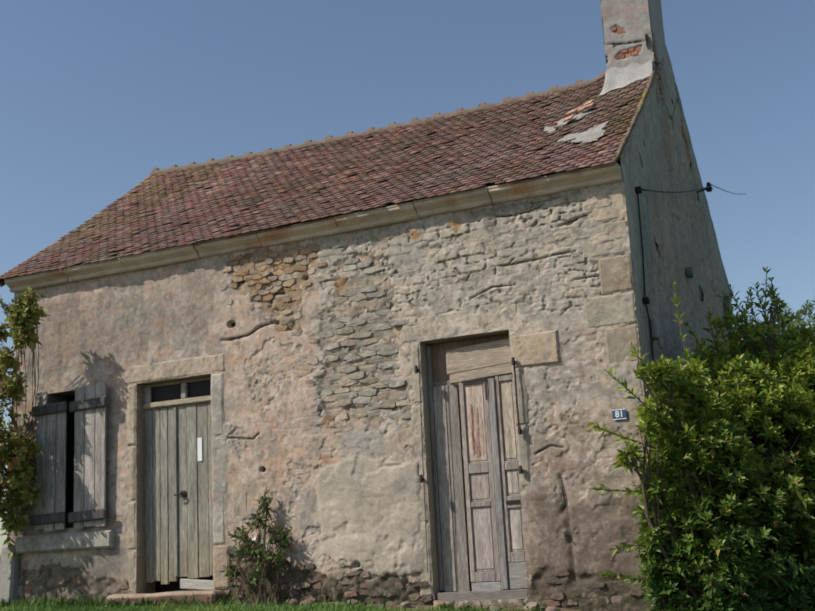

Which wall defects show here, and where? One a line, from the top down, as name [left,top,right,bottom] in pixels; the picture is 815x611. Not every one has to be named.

spalling [607,33,663,107]
peeling [544,99,608,143]
crack [223,292,294,341]
peeling [218,245,328,336]
flaking render [321,258,387,302]
flaking render [320,310,412,427]